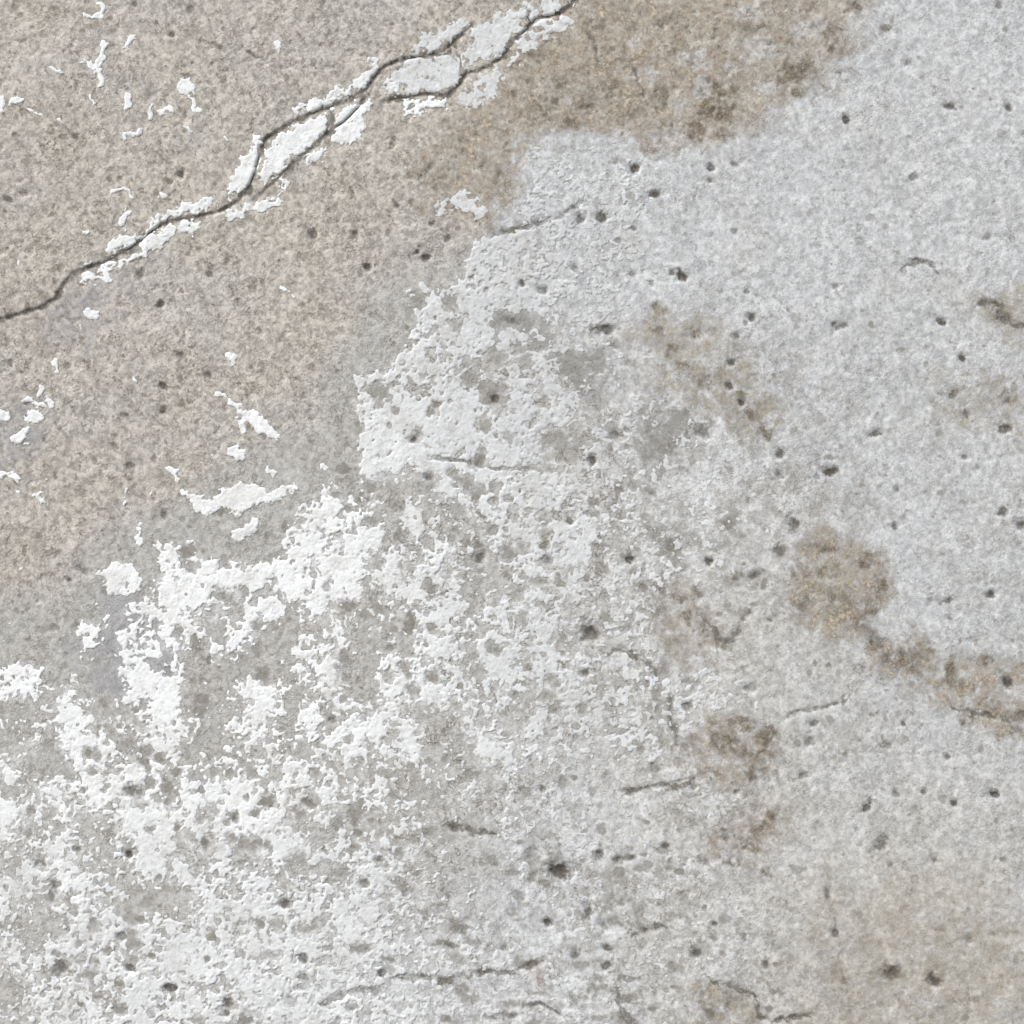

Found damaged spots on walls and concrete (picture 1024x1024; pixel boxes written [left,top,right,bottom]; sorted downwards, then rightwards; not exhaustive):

crack [1,0,578,323]